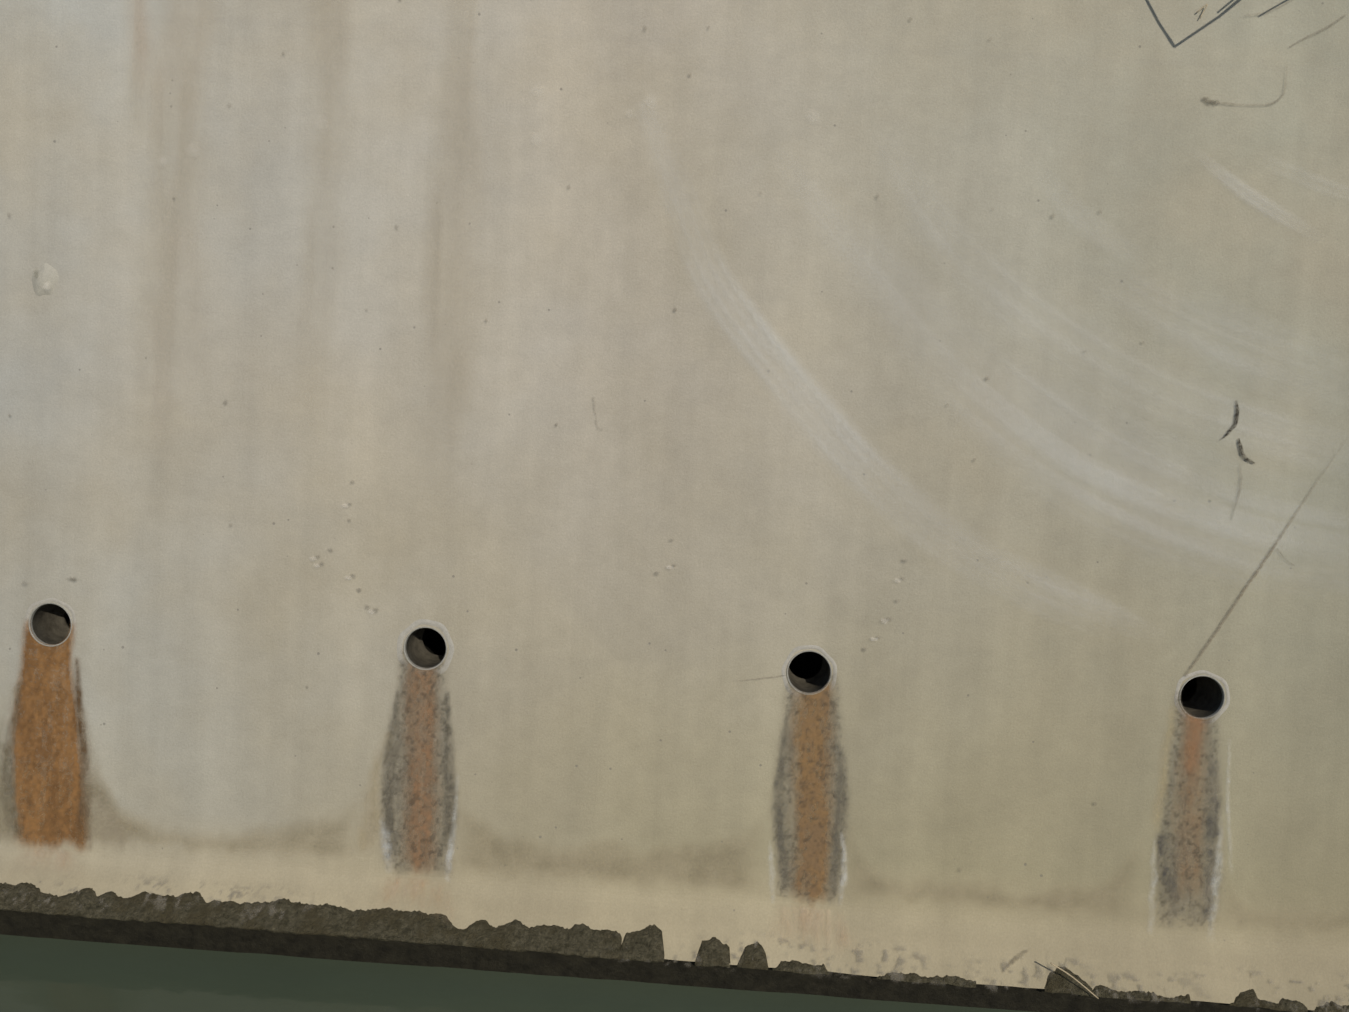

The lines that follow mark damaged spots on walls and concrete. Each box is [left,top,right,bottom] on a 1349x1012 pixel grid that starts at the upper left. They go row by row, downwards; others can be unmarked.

corrosion [0,625,89,846]
corrosion [385,661,451,870]
corrosion [776,685,845,899]
spalling [0,882,665,963]
spalling [695,937,829,975]
spalling [877,972,976,988]
spalling [1044,966,1191,1004]
spalling [1230,989,1349,1012]